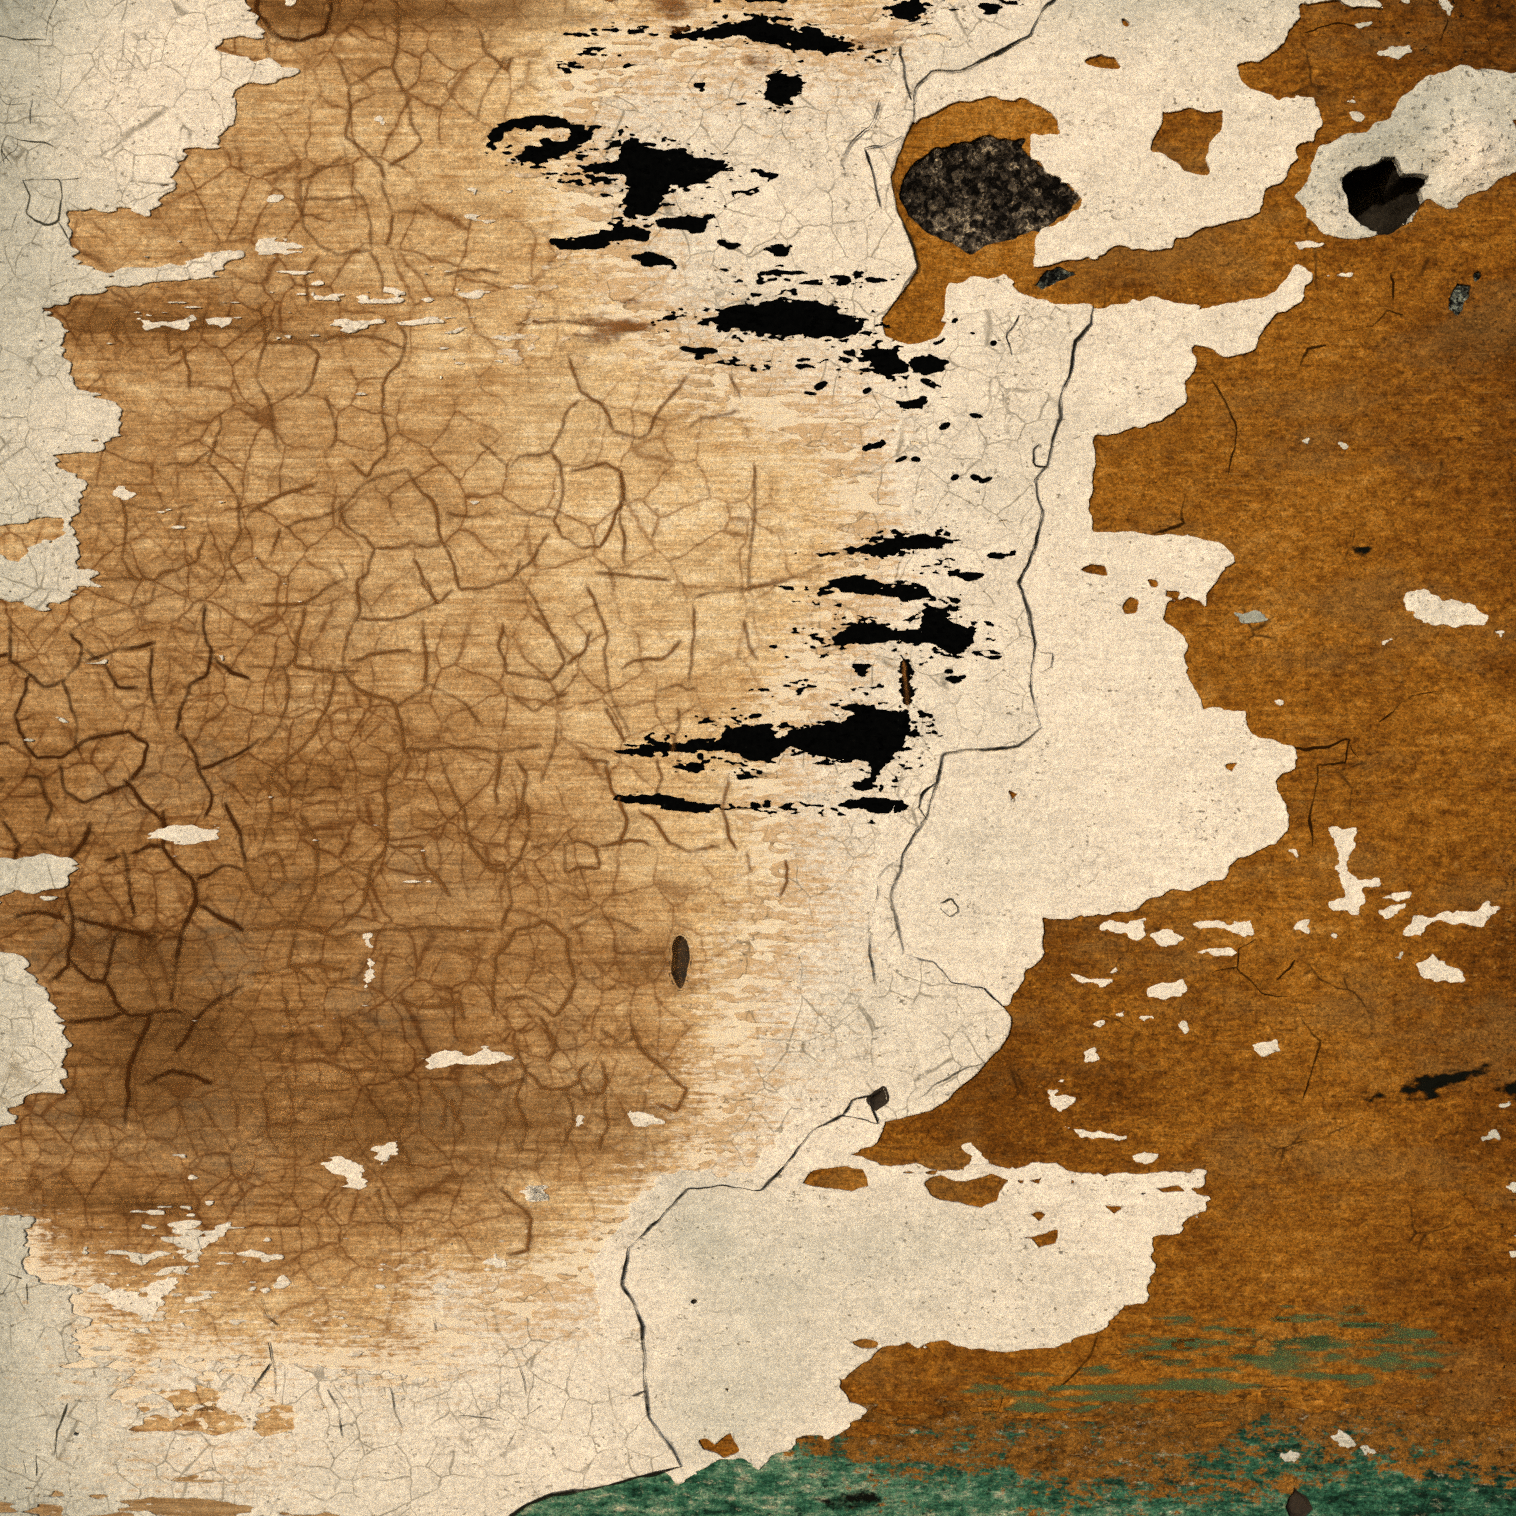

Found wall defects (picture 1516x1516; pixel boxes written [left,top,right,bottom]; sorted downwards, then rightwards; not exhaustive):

crack [0,99,81,239]
crack [255,0,421,300]
crack [841,0,1054,310]
crack [0,317,788,1162]
peeling [0,0,958,1436]
crack [868,304,1094,1007]
peeling [803,0,1516,1438]
crack [503,1191,532,1255]
peeling [90,1475,254,1516]
peeling [699,1433,739,1460]
peeling [1280,1450,1300,1463]
peeling [1330,1429,1376,1455]